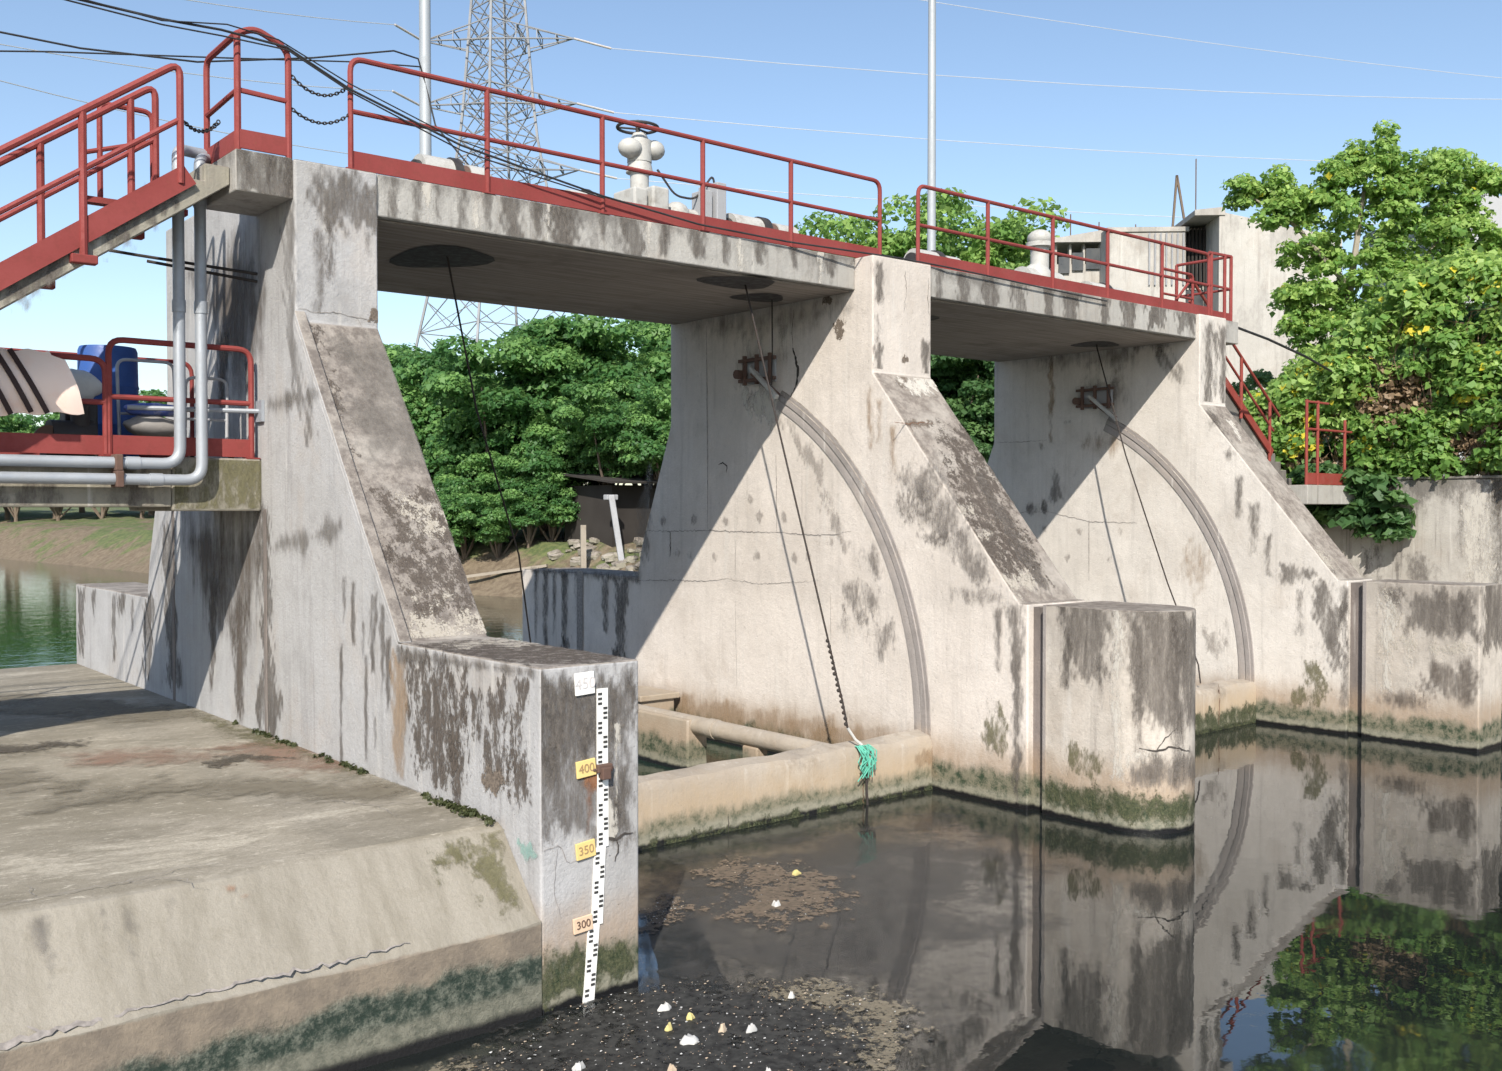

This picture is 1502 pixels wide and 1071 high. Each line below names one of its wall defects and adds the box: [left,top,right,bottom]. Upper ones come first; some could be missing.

damp [415,181,431,222]
damp [459,189,580,245]
damp [599,214,669,257]
damp [690,229,705,257]
damp [722,235,765,271]
damp [0,508,409,812]
damp [340,466,663,839]
damp [903,421,1061,596]
damp [992,598,1022,791]
damp [1061,607,1214,786]
crack [1139,727,1189,752]
damp [1377,478,1502,706]